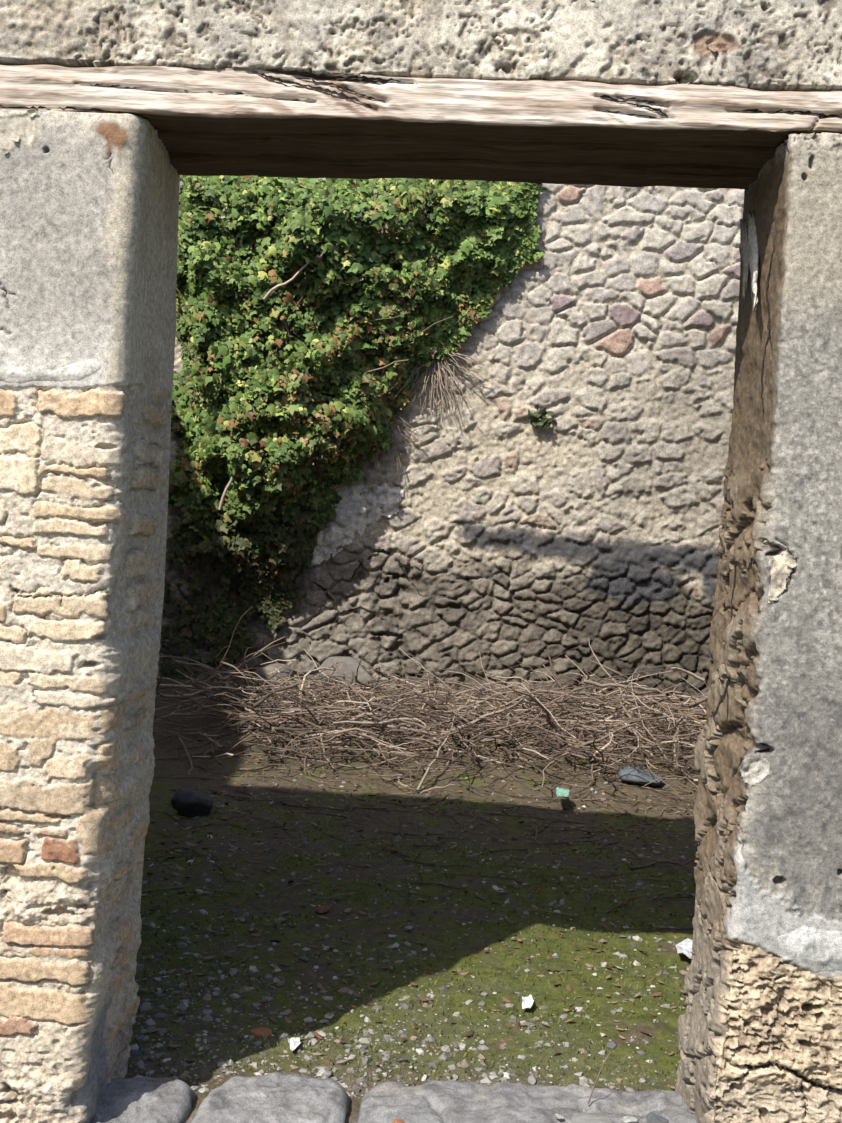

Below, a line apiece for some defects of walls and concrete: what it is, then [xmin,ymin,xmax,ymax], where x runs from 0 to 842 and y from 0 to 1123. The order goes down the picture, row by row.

crack [727,1061,842,1117]